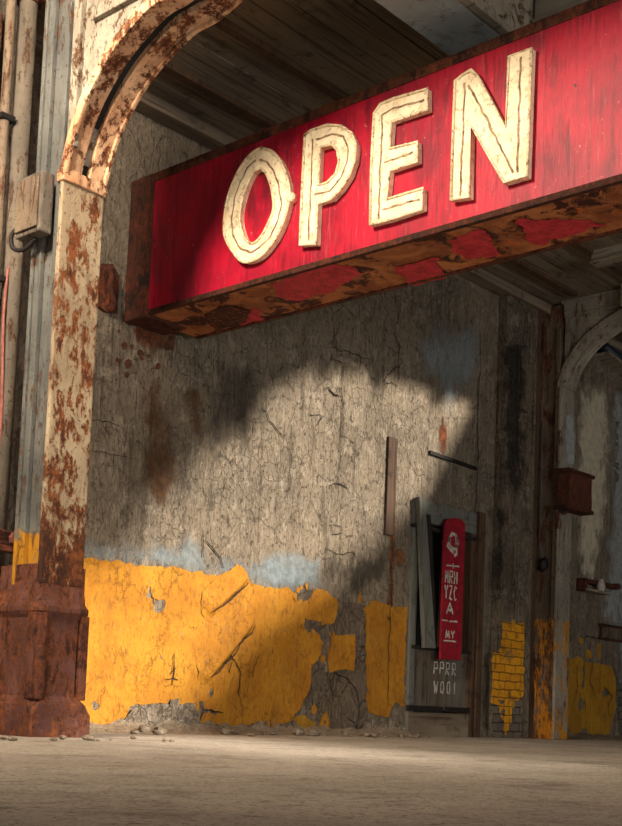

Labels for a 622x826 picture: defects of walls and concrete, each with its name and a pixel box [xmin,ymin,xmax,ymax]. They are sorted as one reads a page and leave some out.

damp [504,345,525,498]
damp [148,389,174,502]
peeling [144,586,165,613]
peeling [293,583,321,606]
spalling [122,685,218,727]
crack [229,655,258,701]
crack [330,671,360,729]
peeling [301,600,403,731]
flaking render [490,697,523,738]